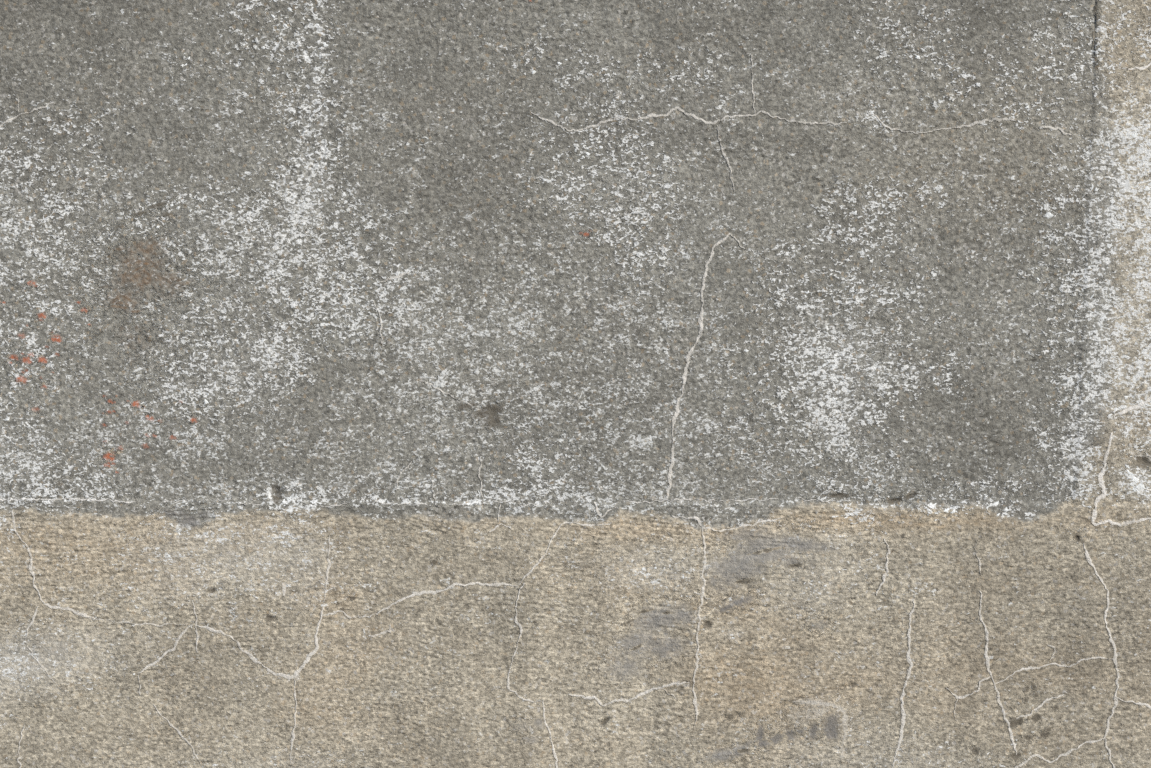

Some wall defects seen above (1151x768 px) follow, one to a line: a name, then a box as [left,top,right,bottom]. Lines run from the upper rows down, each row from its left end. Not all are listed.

crack [1128,62,1151,71]
rust [94,226,197,369]
crack [0,233,846,768]
crack [876,539,891,596]
crack [946,396,1151,768]
crack [892,601,915,768]